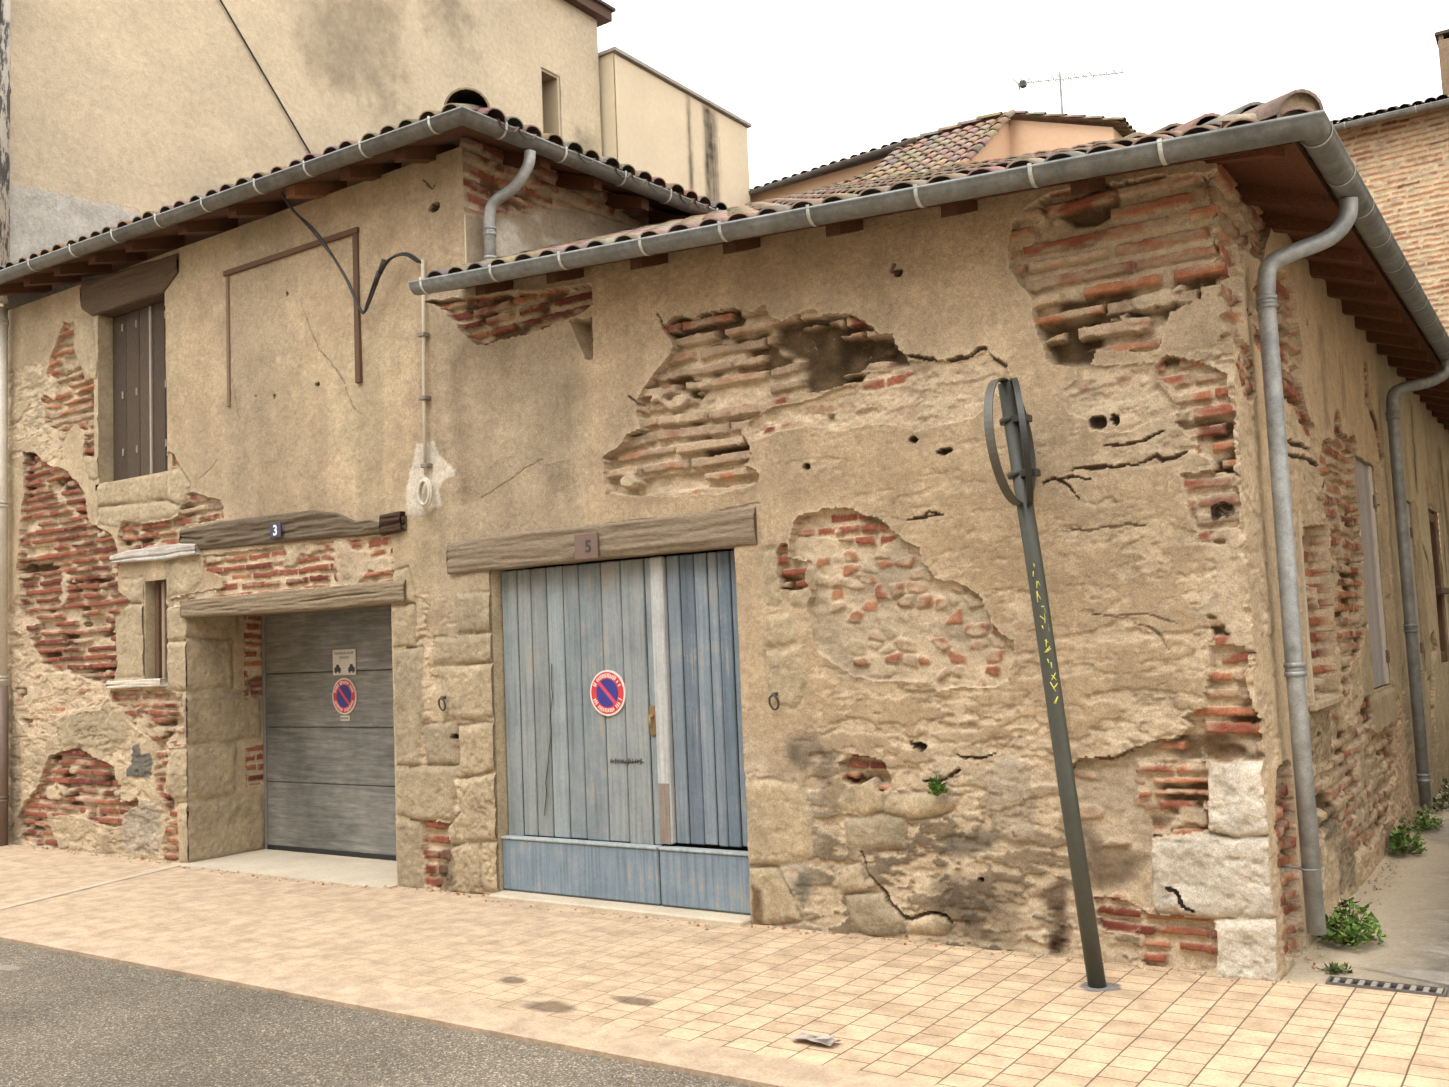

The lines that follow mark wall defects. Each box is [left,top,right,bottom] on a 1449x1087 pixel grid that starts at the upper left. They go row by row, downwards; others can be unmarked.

water stain [690,108,717,201]
flaking render [425,282,593,346]
flaking render [40,321,104,458]
flaking render [602,304,1012,498]
crack [1041,429,1189,534]
flaking render [8,451,224,862]
flaking render [167,535,395,608]
flaking render [776,506,1015,692]
flaking render [1008,164,1306,975]
flaking render [1276,269,1398,895]
crack [1073,738,1167,771]
crack [859,850,954,926]